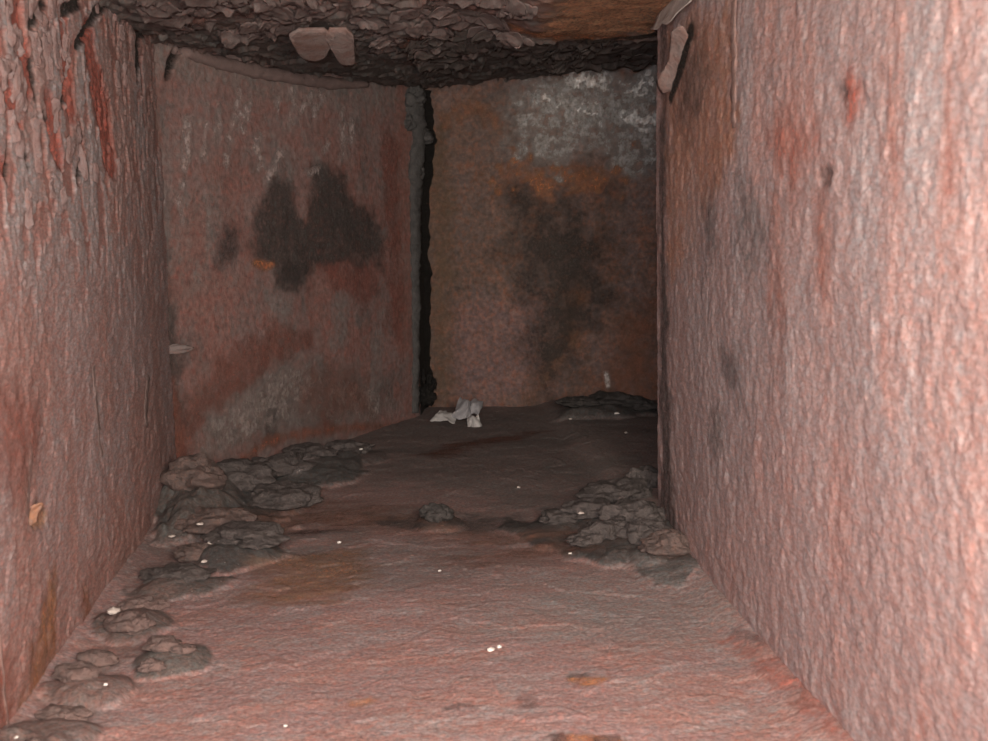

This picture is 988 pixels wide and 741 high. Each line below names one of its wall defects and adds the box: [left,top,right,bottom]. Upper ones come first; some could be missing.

peeling [136,0,694,103]
peeling [0,0,72,211]
peeling [51,97,100,183]
water stain [182,88,252,169]
peeling [25,187,34,230]
crack [404,85,437,415]
water stain [513,71,675,529]